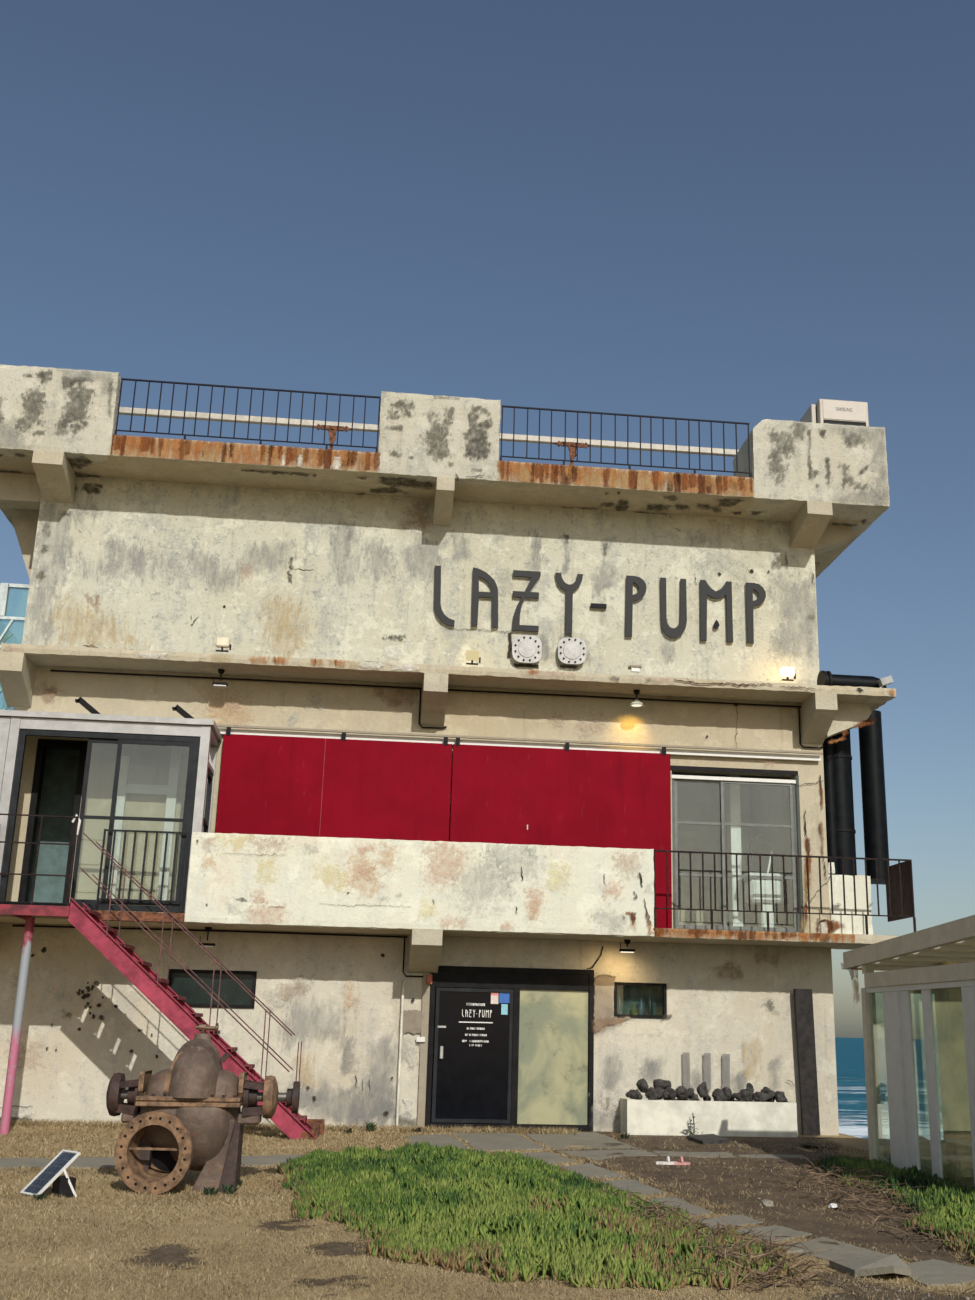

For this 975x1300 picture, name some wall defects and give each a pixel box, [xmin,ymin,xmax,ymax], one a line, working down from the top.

rust [110,435,380,472]
rust [498,461,754,497]
rust [626,911,855,943]